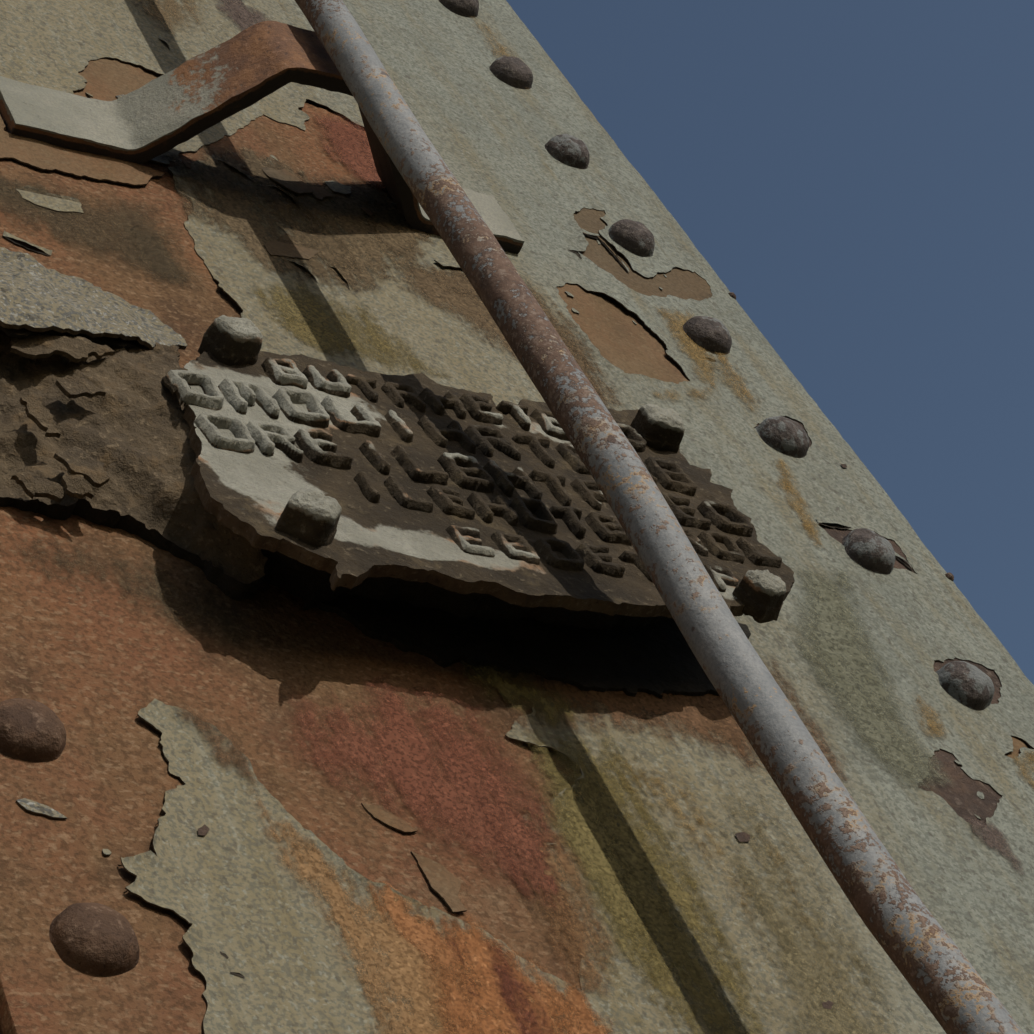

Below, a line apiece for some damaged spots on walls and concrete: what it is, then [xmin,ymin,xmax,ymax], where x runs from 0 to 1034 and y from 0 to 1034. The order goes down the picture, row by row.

peeling [74,59,158,101]
peeling [0,102,392,368]
peeling [573,208,712,301]
corrosion [500,671,759,767]
corrosion [773,669,840,774]
peeling [0,507,581,1034]
peeling [918,750,1002,823]
spalling [735,832,750,842]
corrosion [259,802,609,1034]